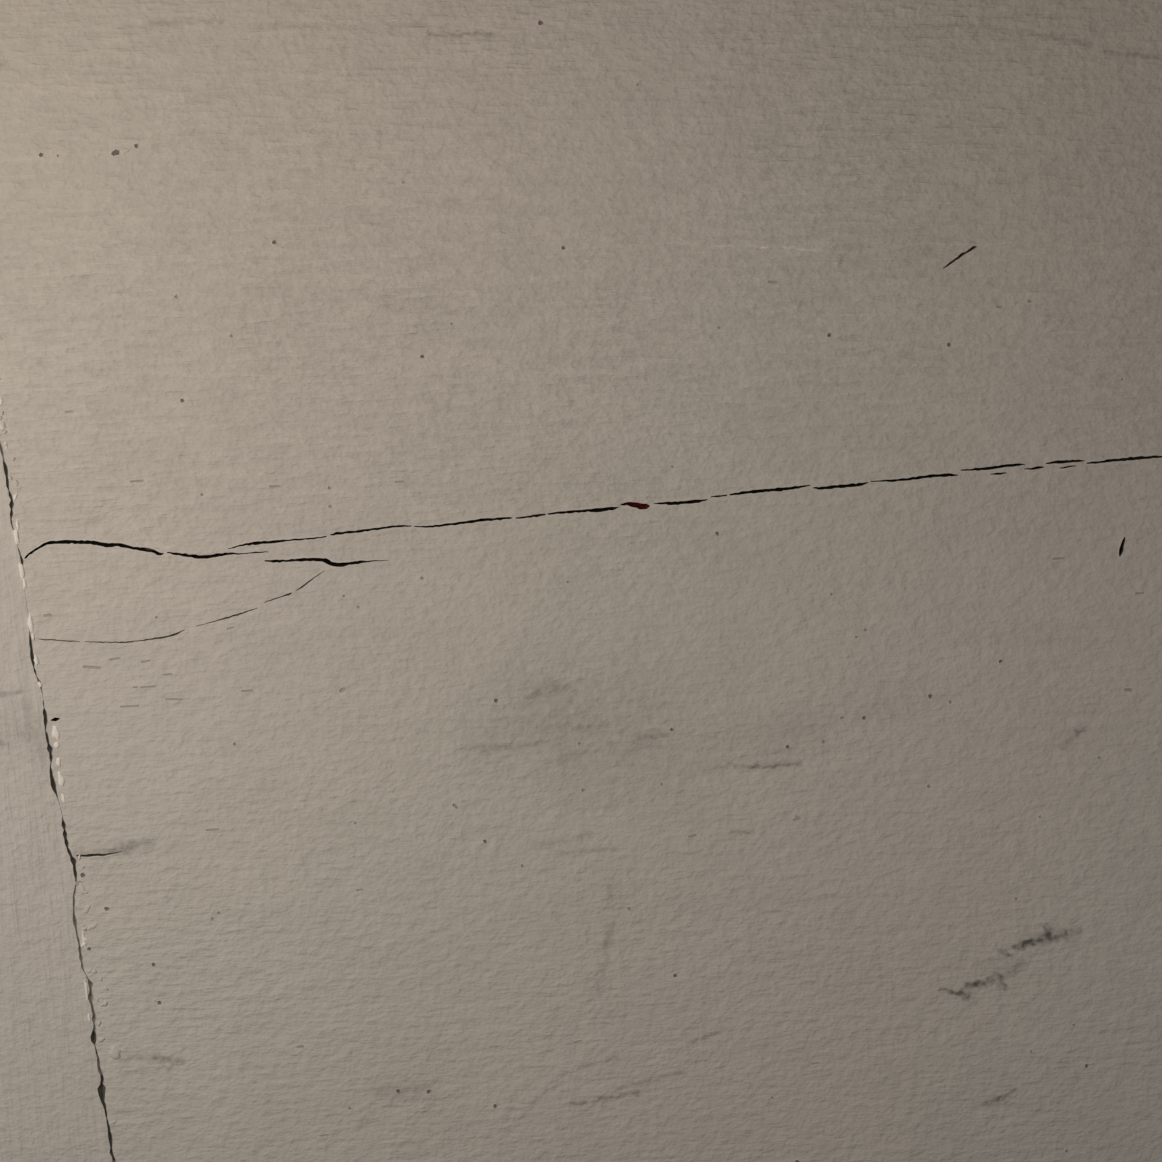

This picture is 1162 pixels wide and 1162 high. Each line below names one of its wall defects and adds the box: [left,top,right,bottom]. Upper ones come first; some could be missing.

crack [0,397,1162,1162]